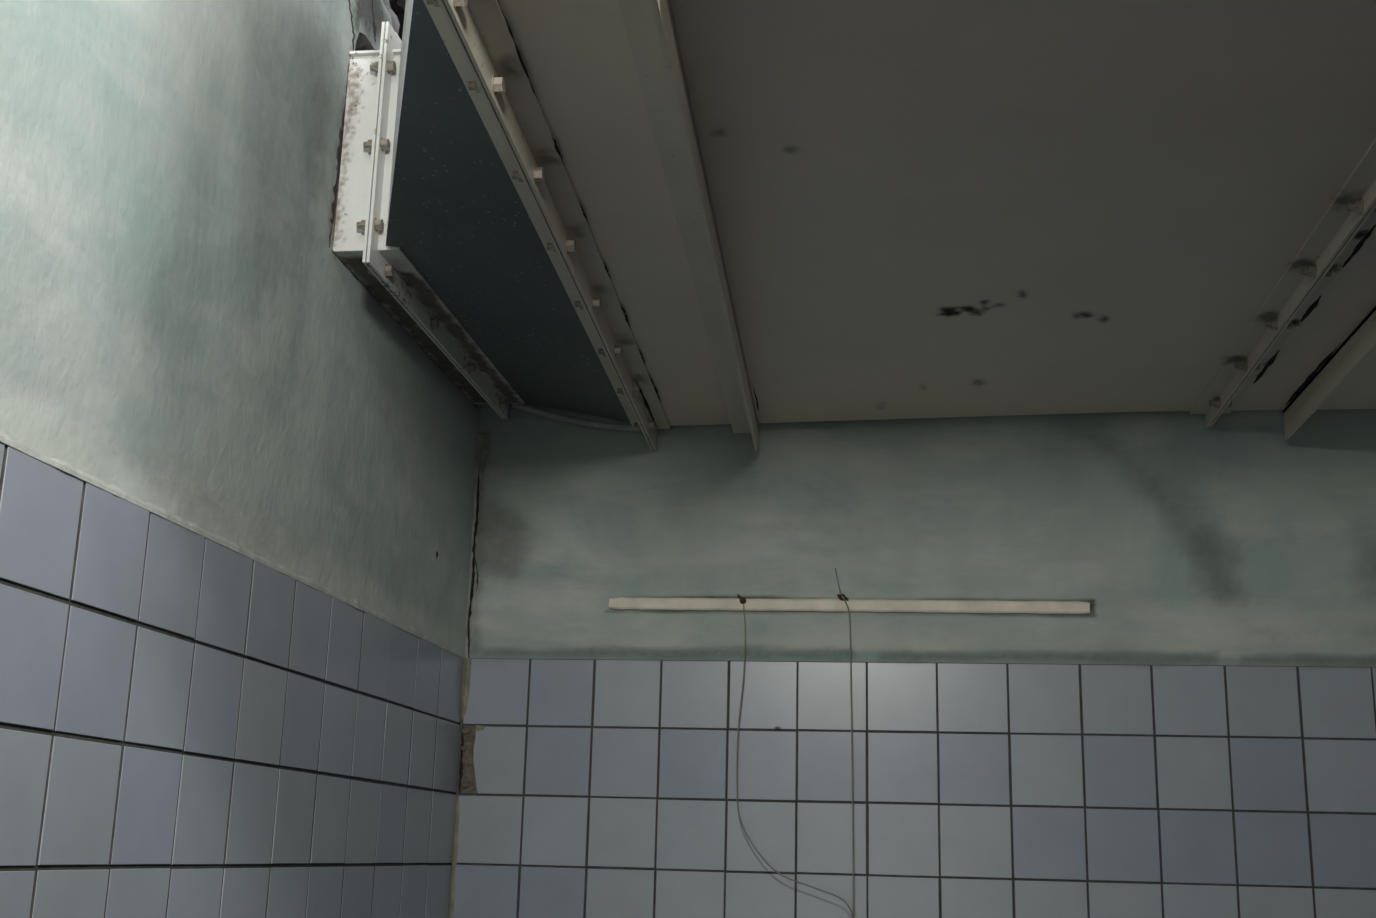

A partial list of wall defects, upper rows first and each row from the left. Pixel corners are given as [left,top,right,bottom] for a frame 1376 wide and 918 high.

spalling [459,725,486,793]